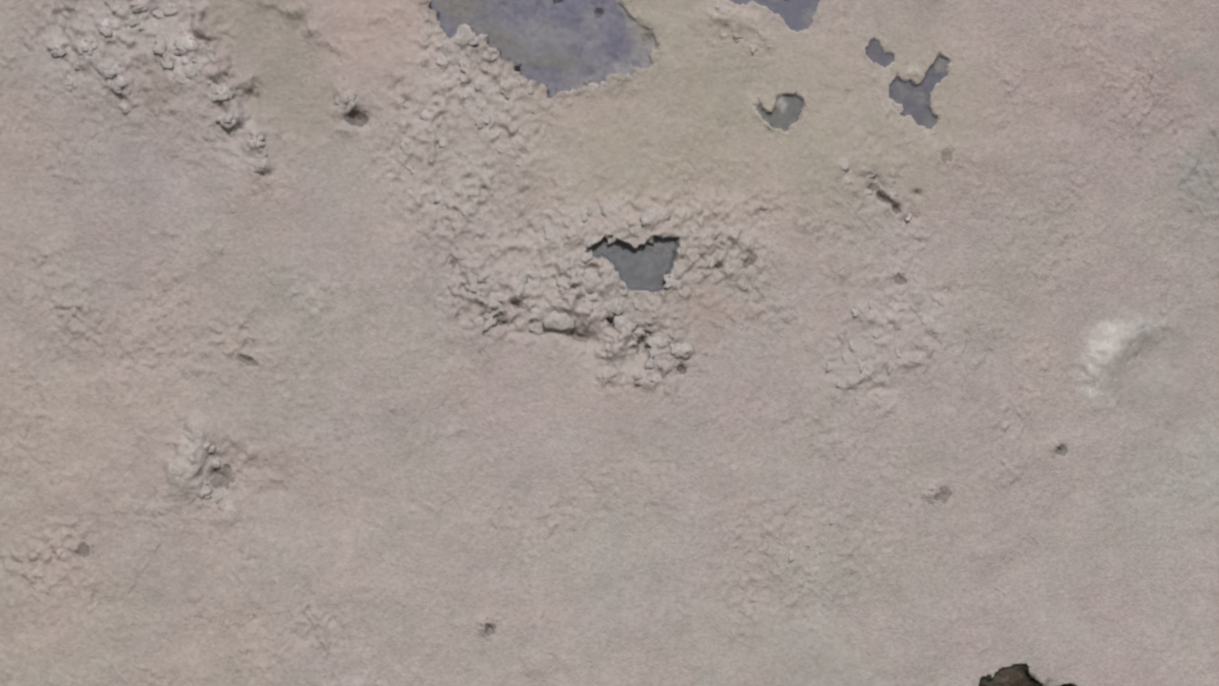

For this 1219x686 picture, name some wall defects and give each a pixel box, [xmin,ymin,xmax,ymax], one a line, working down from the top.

peeling [416,0,660,99]
peeling [708,0,820,54]
peeling [749,93,804,132]
peeling [866,38,949,133]
flaking render [424,171,798,399]
flaking render [979,663,1043,686]